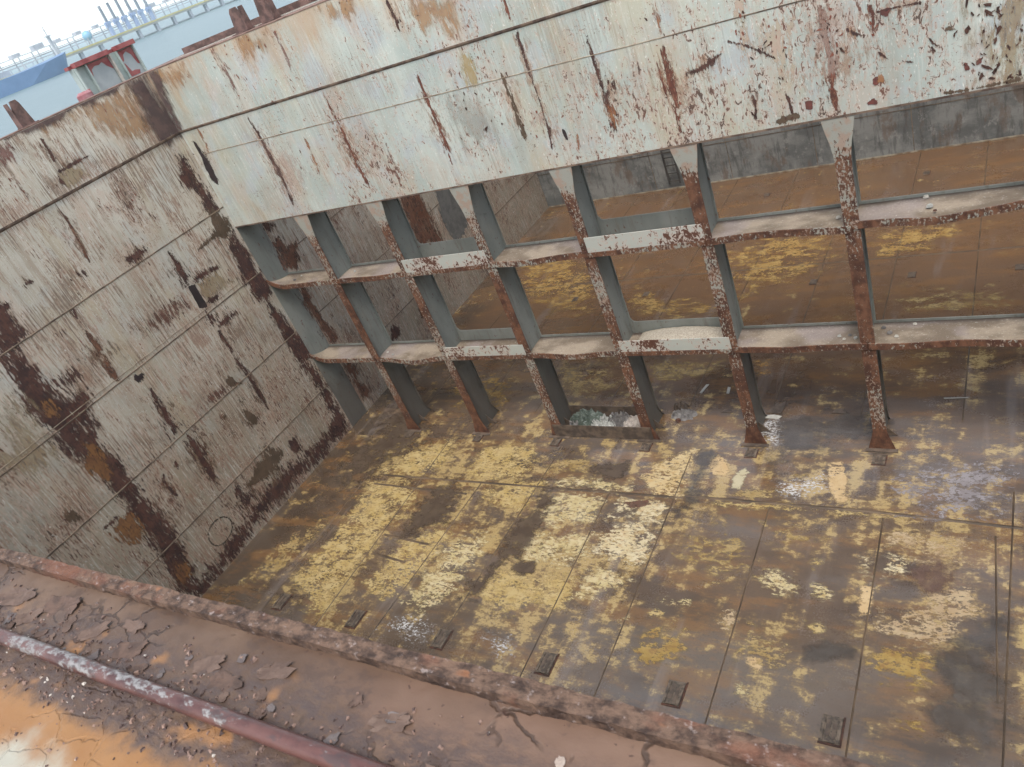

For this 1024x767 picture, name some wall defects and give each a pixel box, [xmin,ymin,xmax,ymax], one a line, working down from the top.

rust [416,72,453,165]
rust [495,70,529,143]
rust [515,32,553,150]
rust [586,35,619,133]
rust [644,2,684,133]
rust [816,2,847,111]
rust [940,0,1024,95]
rust [0,63,347,438]
rust [0,301,203,595]
rust [146,388,221,486]
damp [779,474,831,498]
damp [889,461,1020,521]